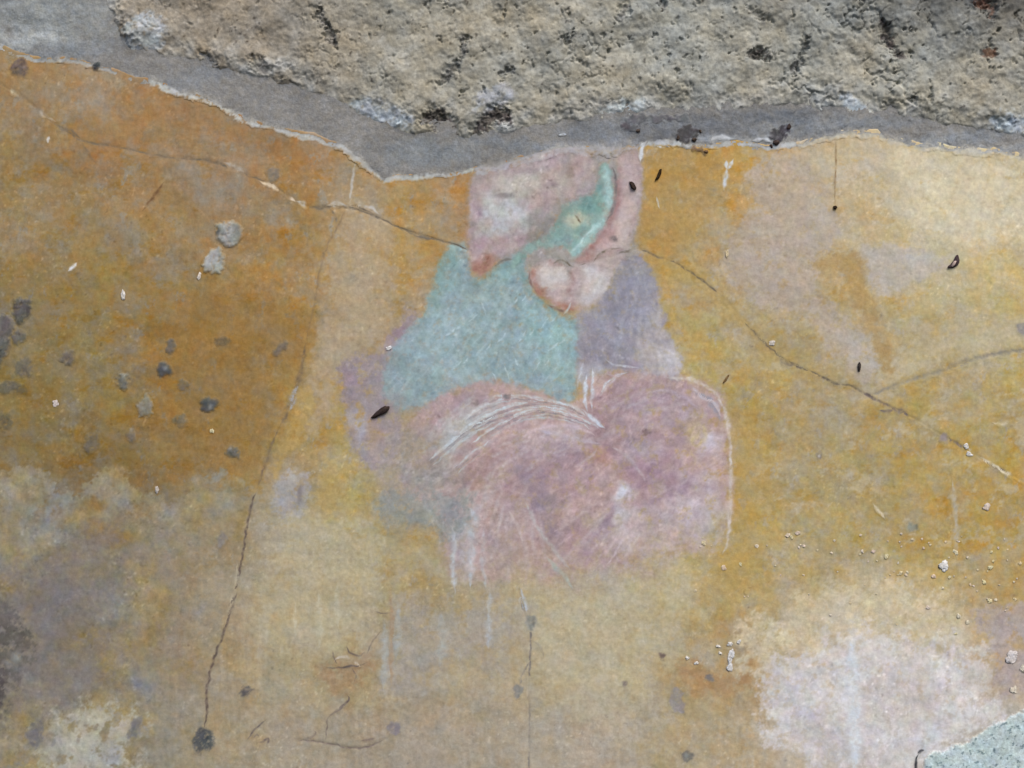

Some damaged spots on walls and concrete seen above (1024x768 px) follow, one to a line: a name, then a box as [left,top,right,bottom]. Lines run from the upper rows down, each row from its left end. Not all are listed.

spalling [311,4,338,48]
spalling [438,33,472,88]
spalling [495,64,515,79]
spalling [744,47,772,61]
spalling [787,32,812,77]
spalling [878,17,909,60]
spalling [980,46,999,60]
crack [553,246,1024,484]
crack [0,80,466,727]
crack [296,611,390,750]
leakage [516,556,1023,768]
crack [246,719,271,746]